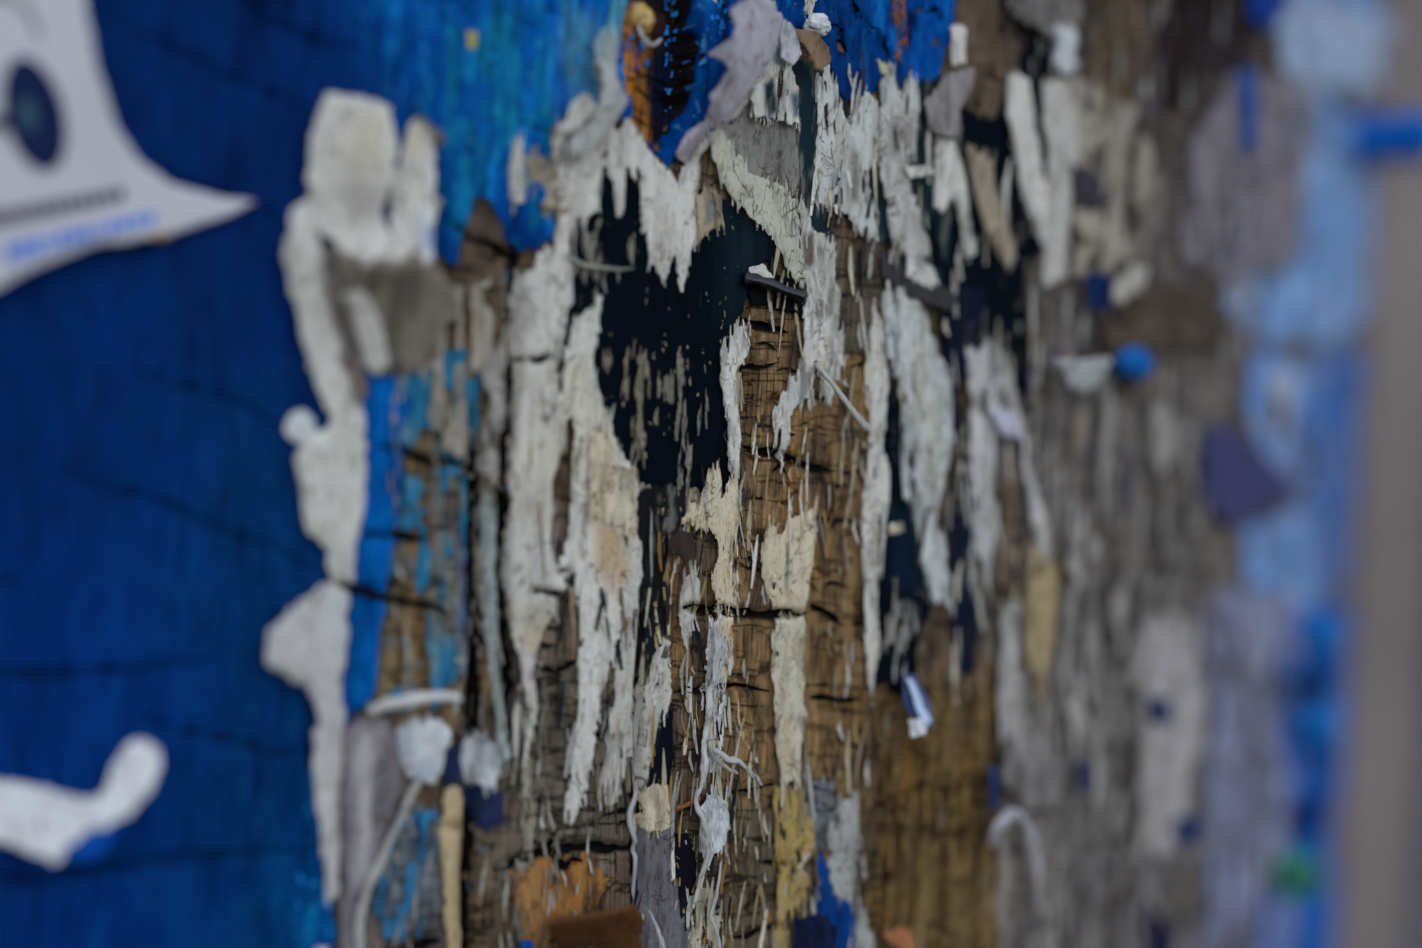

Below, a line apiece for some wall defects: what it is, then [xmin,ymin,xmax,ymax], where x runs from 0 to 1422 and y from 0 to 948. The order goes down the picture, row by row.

peeling [461,49,533,214]
peeling [569,0,728,132]
spalling [748,272,808,317]
peeling [833,229,881,354]
peeling [1085,272,1113,313]
peeling [367,274,508,715]
peeling [1201,418,1293,527]
peeling [373,810,441,943]
peeling [627,774,692,948]
peeling [699,784,731,870]
peeling [771,777,857,948]
peeling [988,725,1095,816]